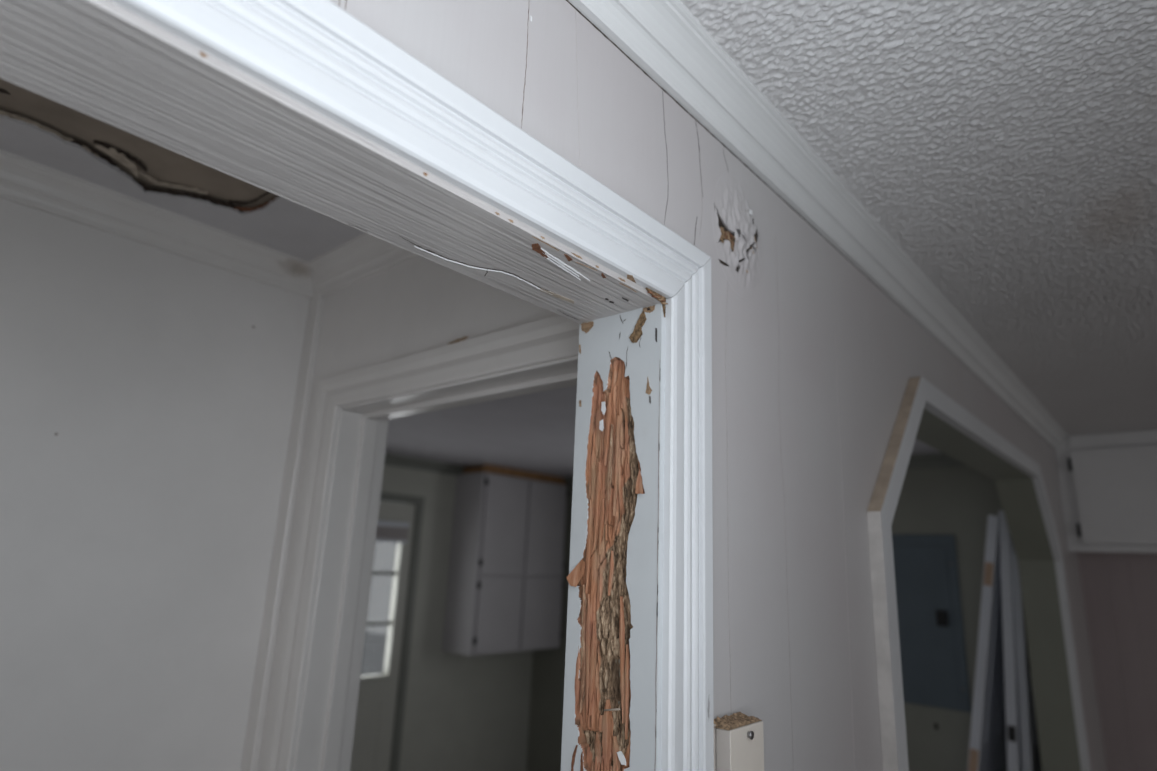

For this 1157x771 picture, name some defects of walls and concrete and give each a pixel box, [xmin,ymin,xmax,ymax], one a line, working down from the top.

peeling [532,236,637,303]
spalling [714,204,757,272]